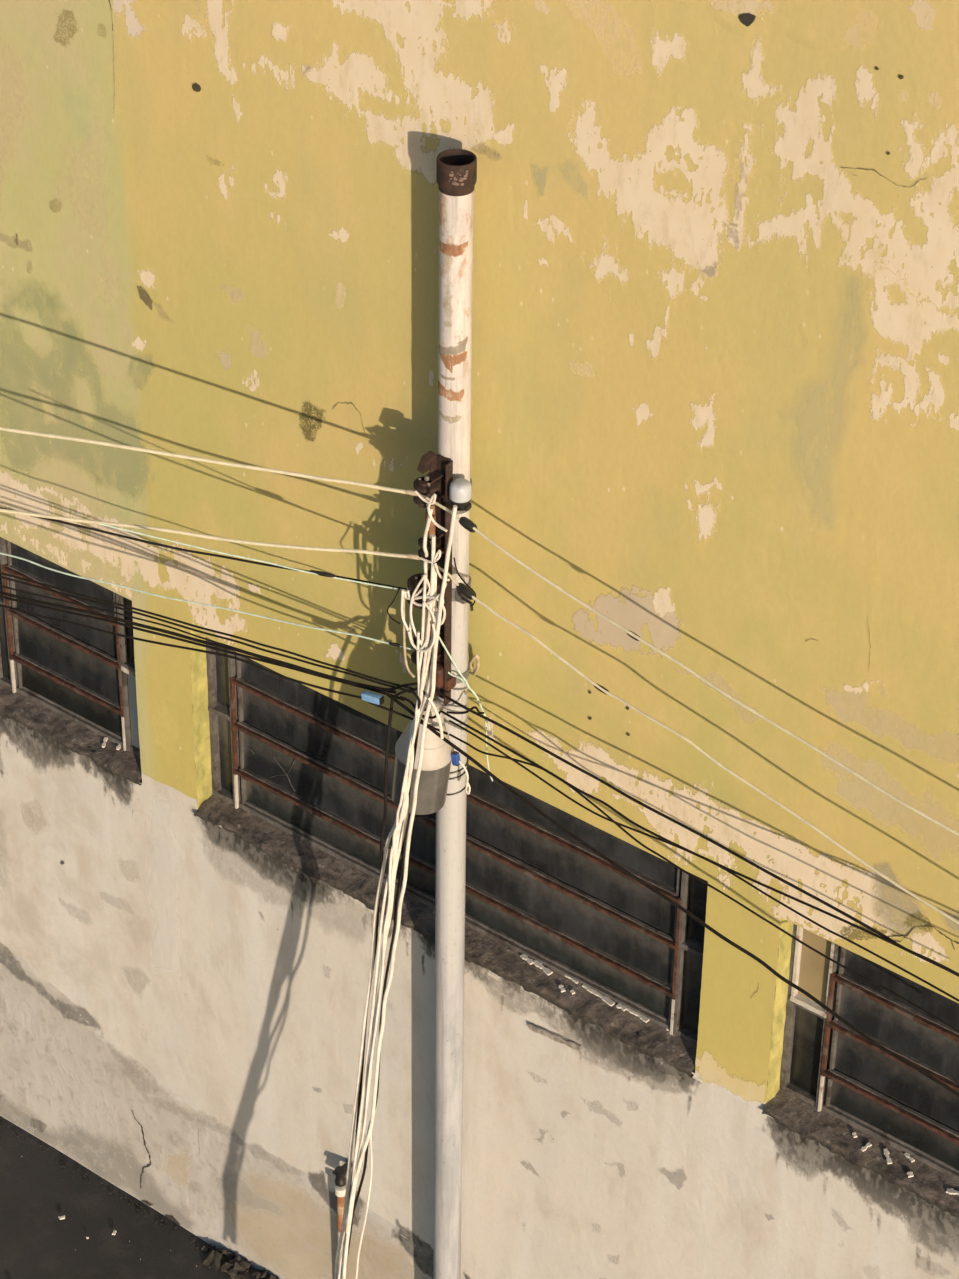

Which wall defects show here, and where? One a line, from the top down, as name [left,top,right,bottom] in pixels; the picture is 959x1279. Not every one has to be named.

peeling [181,0,516,184]
peeling [539,13,959,431]
peeling [0,470,261,647]
peeling [571,585,683,658]
leakage [200,818,344,912]
peeling [526,717,949,963]
leakage [0,944,100,1029]
leakage [464,960,701,1109]
leakage [0,1106,190,1228]
crack [131,1110,151,1188]
leakage [218,1158,434,1279]
leakage [767,1116,959,1264]